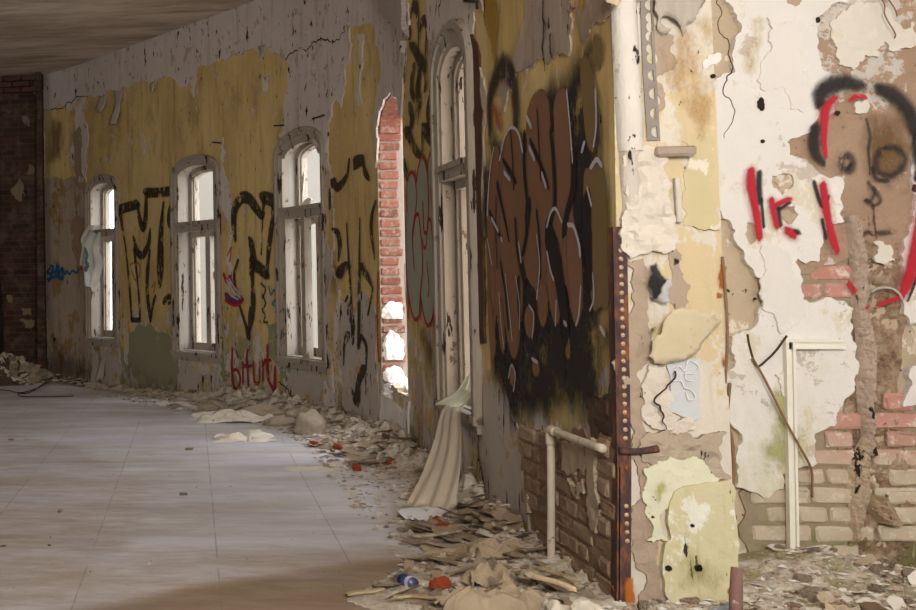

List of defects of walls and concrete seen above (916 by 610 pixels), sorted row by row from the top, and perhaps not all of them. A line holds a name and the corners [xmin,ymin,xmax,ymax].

flaking render [43,0,412,436]
crack [285,31,345,60]
flaking render [479,0,612,214]
peeling [648,32,678,119]
peeling [698,53,721,78]
crack [716,0,735,134]
flaking render [745,0,916,334]
flaking render [477,134,732,601]
corrosion [618,445,660,455]
flaking render [737,474,787,552]
flaking render [798,393,916,567]
corrosion [625,577,635,604]